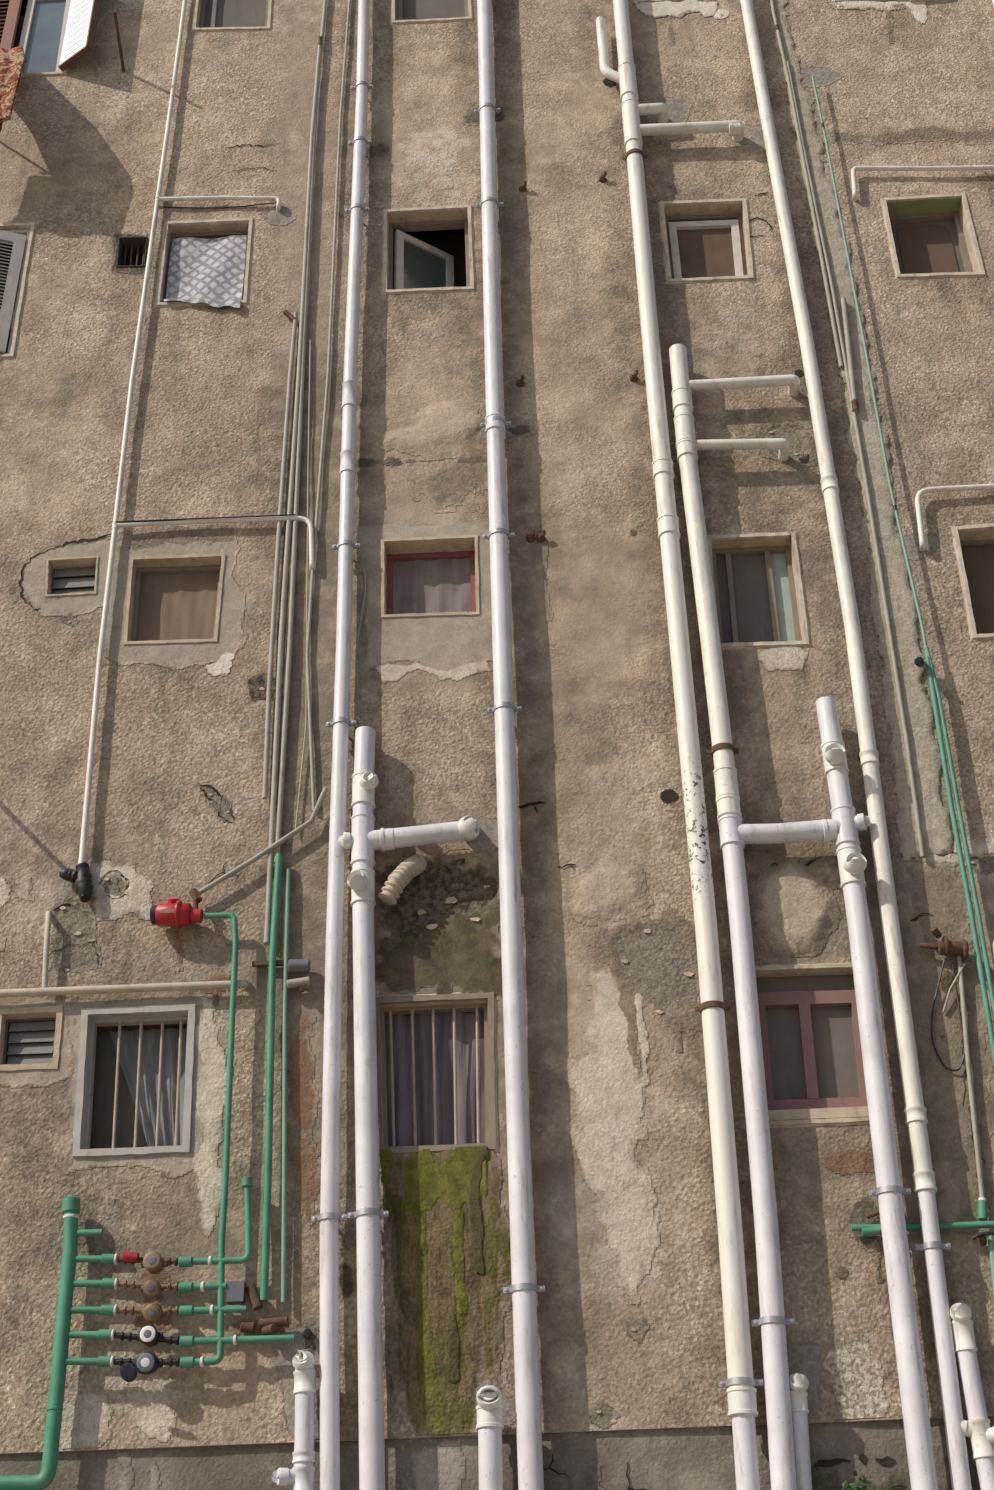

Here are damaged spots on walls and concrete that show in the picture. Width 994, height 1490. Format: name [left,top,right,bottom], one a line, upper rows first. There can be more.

crack [19,534,111,610]
flaking render [204,652,276,702]
flaking render [375,660,492,683]
flaking render [198,784,235,823]
crack [626,1462,646,1490]